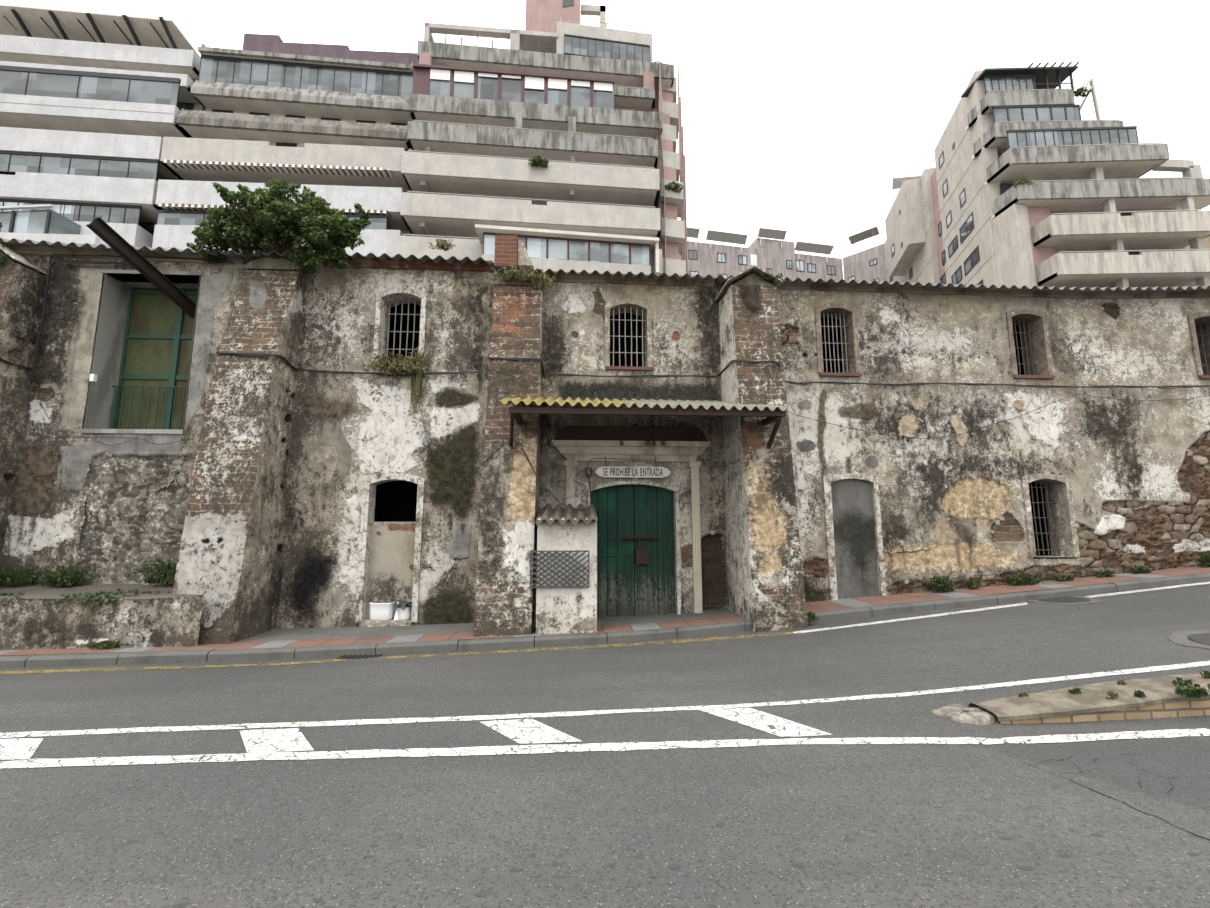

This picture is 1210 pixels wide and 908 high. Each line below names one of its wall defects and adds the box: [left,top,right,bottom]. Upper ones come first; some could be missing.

peeling [28,388,54,423]
leakage [1086,396,1135,442]
spalling [680,530,729,611]
peeling [742,419,789,580]
peeling [884,473,1088,595]
leakage [1121,458,1146,507]